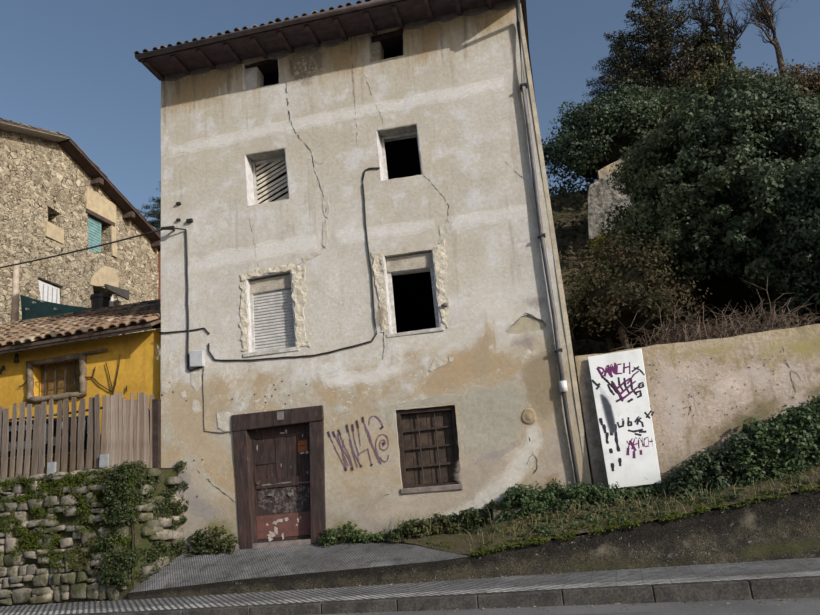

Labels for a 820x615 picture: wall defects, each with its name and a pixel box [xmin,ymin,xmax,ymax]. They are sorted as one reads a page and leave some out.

damp [289,39,359,82]
damp [417,22,443,61]
damp [164,69,233,110]
crack [284,82,330,264]
flaking render [505,313,546,334]
damp [522,351,561,419]
damp [178,468,221,522]